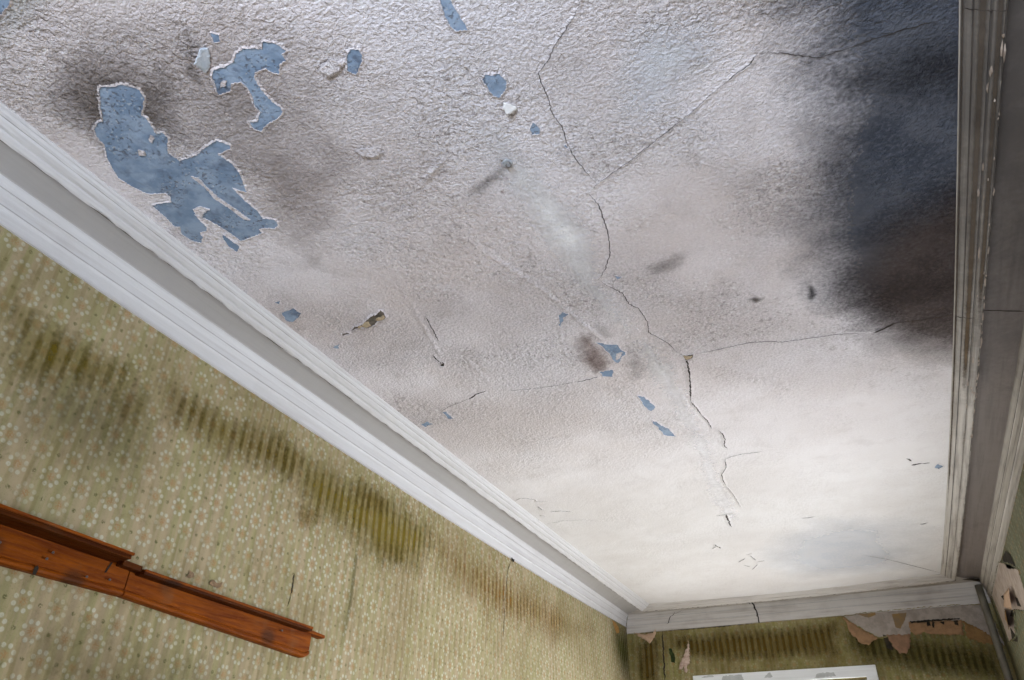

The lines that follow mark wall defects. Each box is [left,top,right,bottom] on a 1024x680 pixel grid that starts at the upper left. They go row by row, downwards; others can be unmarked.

damp [77,81,118,121]
peeling [194,31,289,133]
peeling [319,46,365,78]
peeling [480,71,517,115]
peeling [91,81,280,253]
damp [783,0,1024,345]
crack [535,0,1024,549]
damp [23,318,125,378]
crack [423,316,442,364]
crack [440,374,600,411]
damp [177,398,426,563]
spalling [842,551,1024,650]